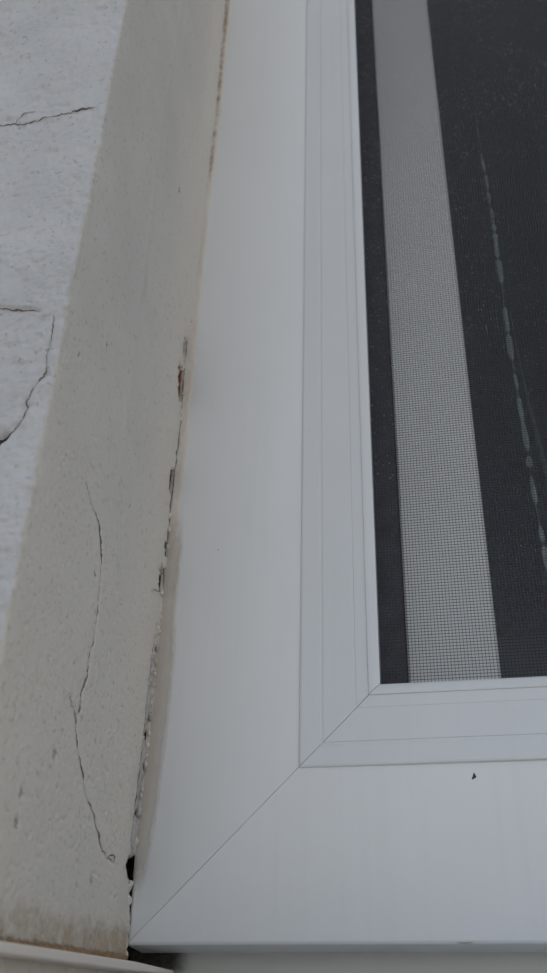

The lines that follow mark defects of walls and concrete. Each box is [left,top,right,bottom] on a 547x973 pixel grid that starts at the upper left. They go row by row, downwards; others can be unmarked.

crack [0,107,97,126]
crack [0,315,54,445]
crack [70,482,115,862]